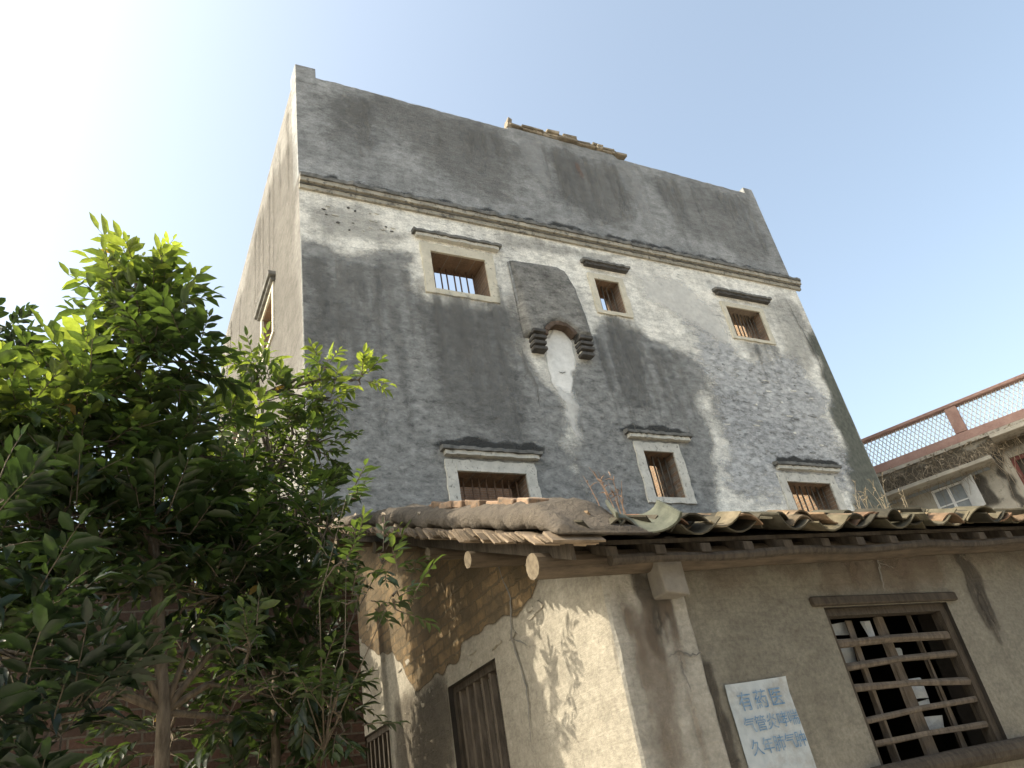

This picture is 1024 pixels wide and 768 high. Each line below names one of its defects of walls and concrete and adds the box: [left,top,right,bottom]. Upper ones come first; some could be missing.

water stain [511,215,751,267]
water stain [301,240,729,517]
spalling [545,330,579,435]
water stain [776,456,838,465]
spalling [330,539,544,707]
crack [498,567,531,742]
water stain [954,554,1002,644]